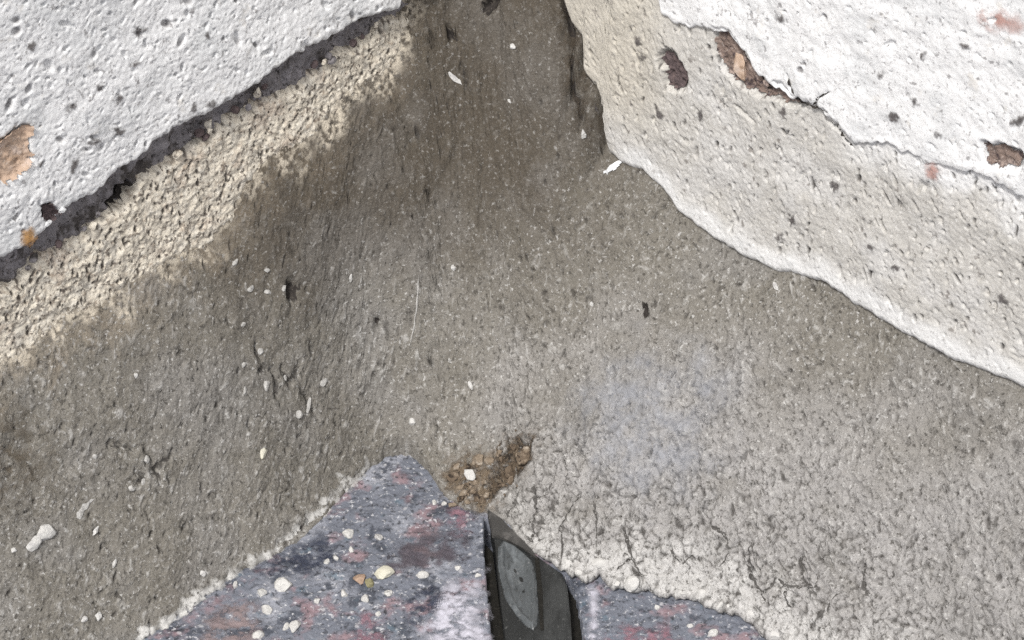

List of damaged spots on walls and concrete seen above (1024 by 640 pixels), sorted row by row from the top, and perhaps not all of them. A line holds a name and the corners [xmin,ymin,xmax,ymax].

spalling [662,50,688,89]
spalling [714,31,804,116]
flaking render [0,125,42,185]
crack [0,0,408,283]
crack [767,78,853,146]
spalling [984,141,1024,168]
spalling [445,429,535,512]
damp [248,459,369,574]
damp [136,571,237,640]